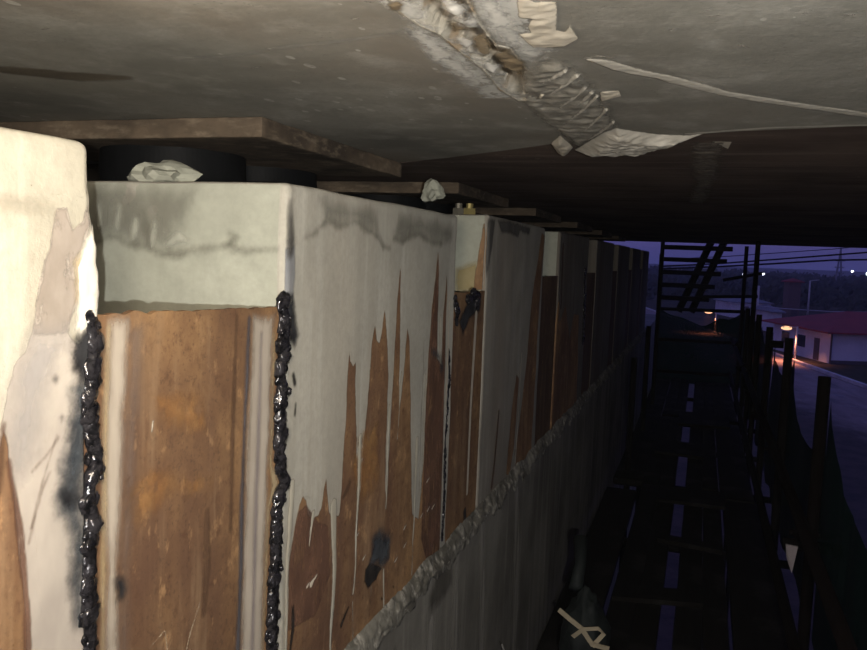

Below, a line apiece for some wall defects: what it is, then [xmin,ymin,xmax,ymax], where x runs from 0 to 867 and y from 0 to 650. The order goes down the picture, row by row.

spalling [388,0,621,156]
crack [586,56,867,135]
water stain [96,194,176,235]
corrosion [474,224,487,290]
corrosion [506,233,544,475]